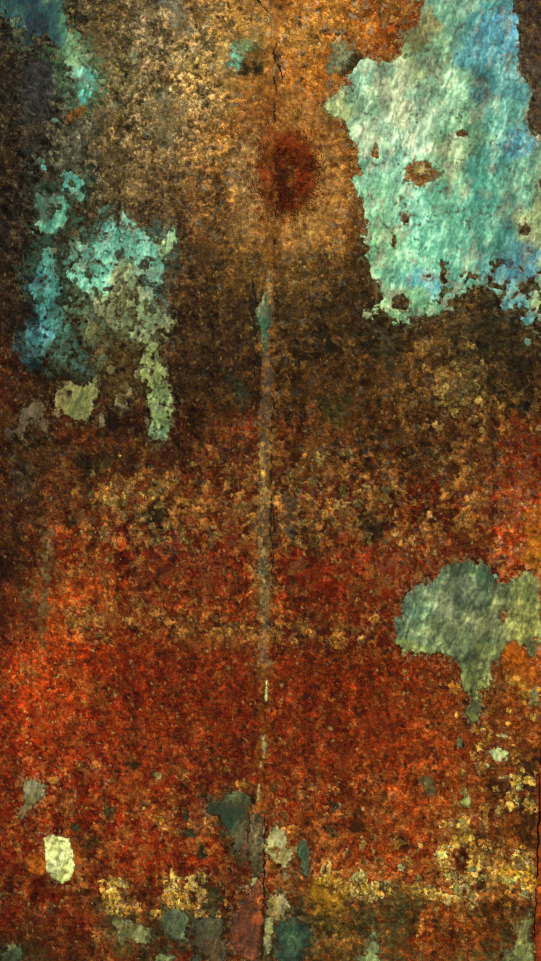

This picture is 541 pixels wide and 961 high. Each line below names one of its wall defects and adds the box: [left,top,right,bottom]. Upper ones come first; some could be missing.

corrosion [237,100,338,247]
peeling [322,0,541,346]
peeling [4,170,179,441]
corrosion [87,466,219,549]
corrosion [272,448,438,556]
peeling [393,561,541,723]
peeling [43,834,76,884]
peeling [263,825,314,961]
corrosion [239,782,423,896]
corrosion [433,828,494,901]
peeling [488,733,508,762]
corrosion [458,640,541,909]